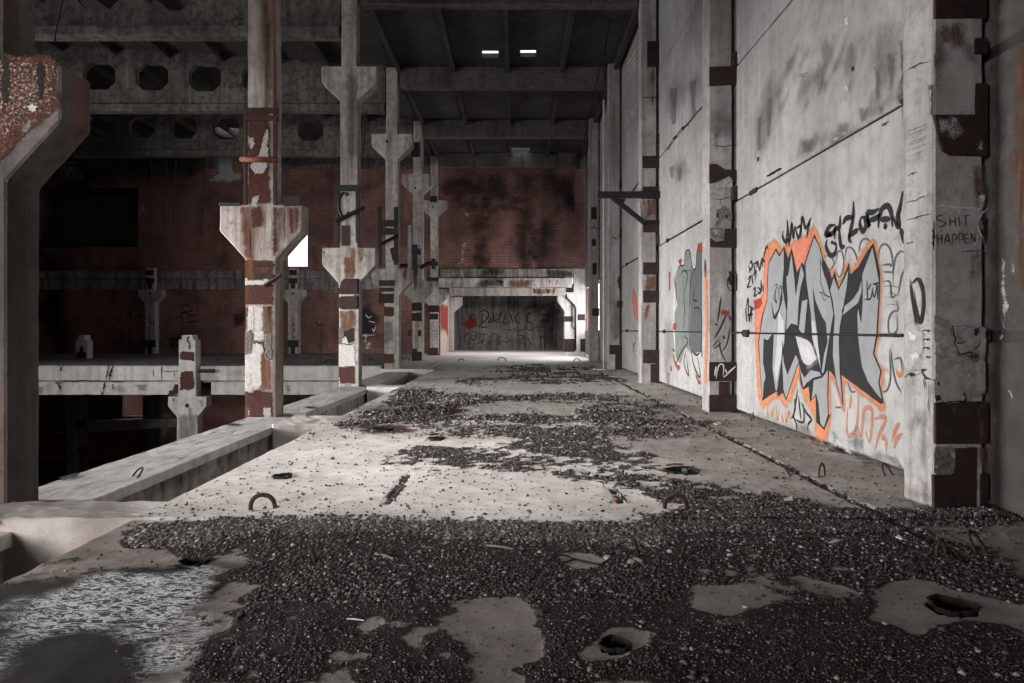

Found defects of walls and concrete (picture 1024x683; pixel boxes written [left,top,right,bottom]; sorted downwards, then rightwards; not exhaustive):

rust [0,58,11,104]
rust [37,61,45,98]
spalling [232,129,269,174]
rust [240,107,299,334]
peeling [245,305,273,391]
peeling [339,328,356,383]